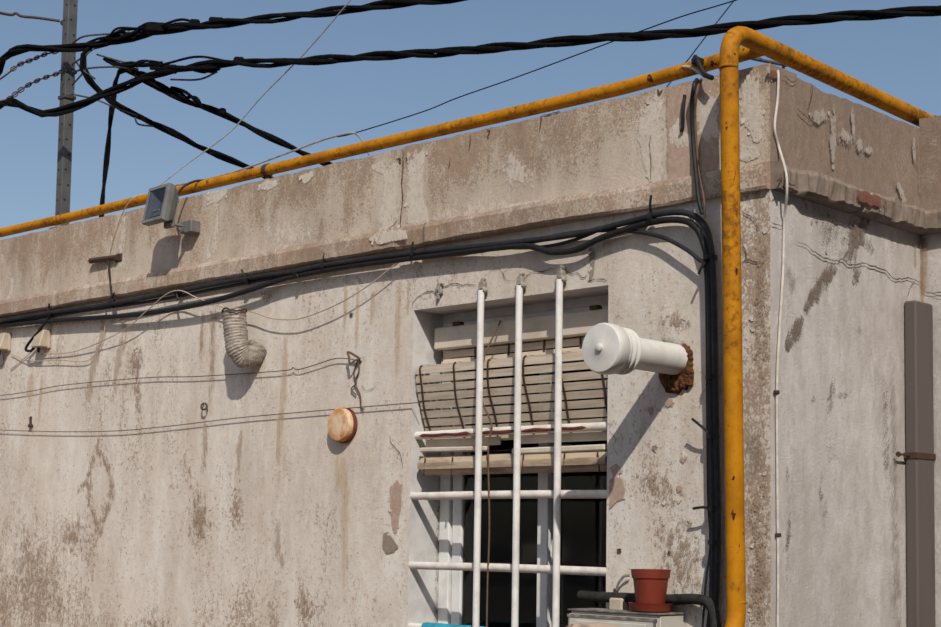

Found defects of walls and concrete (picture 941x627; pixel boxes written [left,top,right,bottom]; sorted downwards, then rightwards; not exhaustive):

peeling [809,104,873,171]
crack [389,158,404,229]
spalling [369,228,408,245]
crack [741,211,783,263]
crack [799,242,941,297]
spalling [382,480,402,554]
peeling [609,464,626,509]
peeling [636,466,705,594]